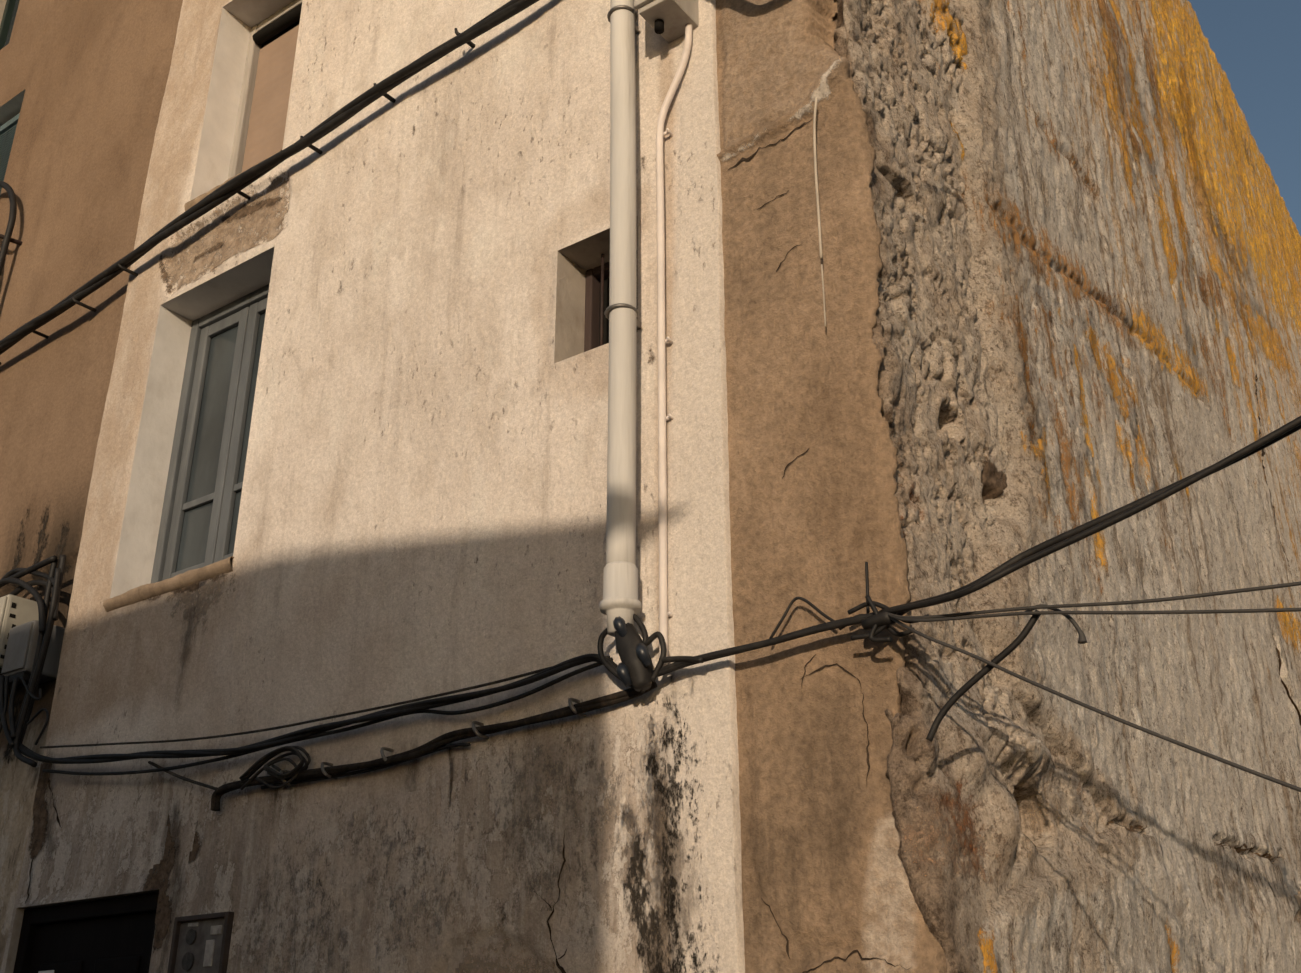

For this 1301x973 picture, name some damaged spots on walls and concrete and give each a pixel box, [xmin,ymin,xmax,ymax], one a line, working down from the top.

peeling [159,171,290,294]
spalling [832,0,1146,973]
peeling [993,267,1174,600]
crack [534,828,567,973]
leakage [623,694,720,973]
crack [762,899,910,973]
crack [1218,648,1301,870]